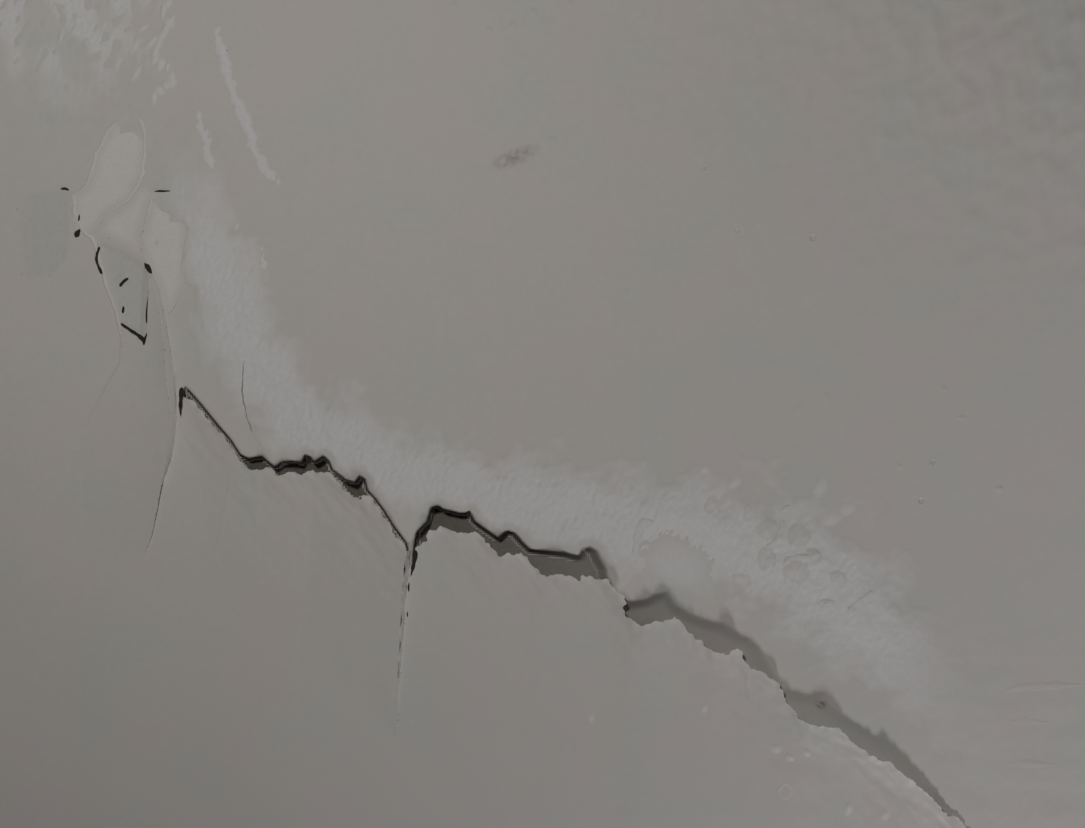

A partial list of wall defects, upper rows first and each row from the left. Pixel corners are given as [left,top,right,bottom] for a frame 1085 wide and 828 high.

peeling [61,116,966,828]
crack [179,363,961,821]